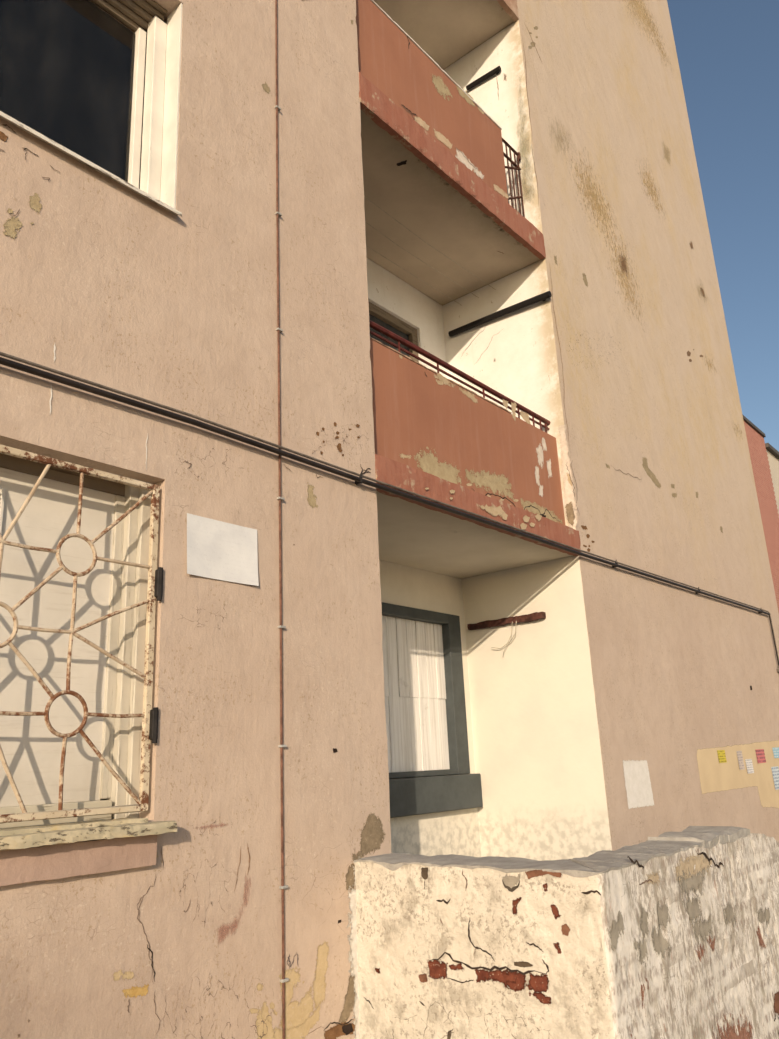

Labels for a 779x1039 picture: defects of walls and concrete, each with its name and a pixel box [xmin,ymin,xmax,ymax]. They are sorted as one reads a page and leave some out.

flaking render [401,104,509,198]
peeling [3,193,42,239]
peeling [399,447,519,520]
crack [180,860,227,926]
spalling [345,813,386,890]
crack [627,856,653,885]
crack [137,848,164,1032]
crack [468,920,494,960]
peeling [189,940,355,1039]
crack [365,998,550,1039]
flaking render [418,952,551,1005]
flaking render [712,1009,753,1039]